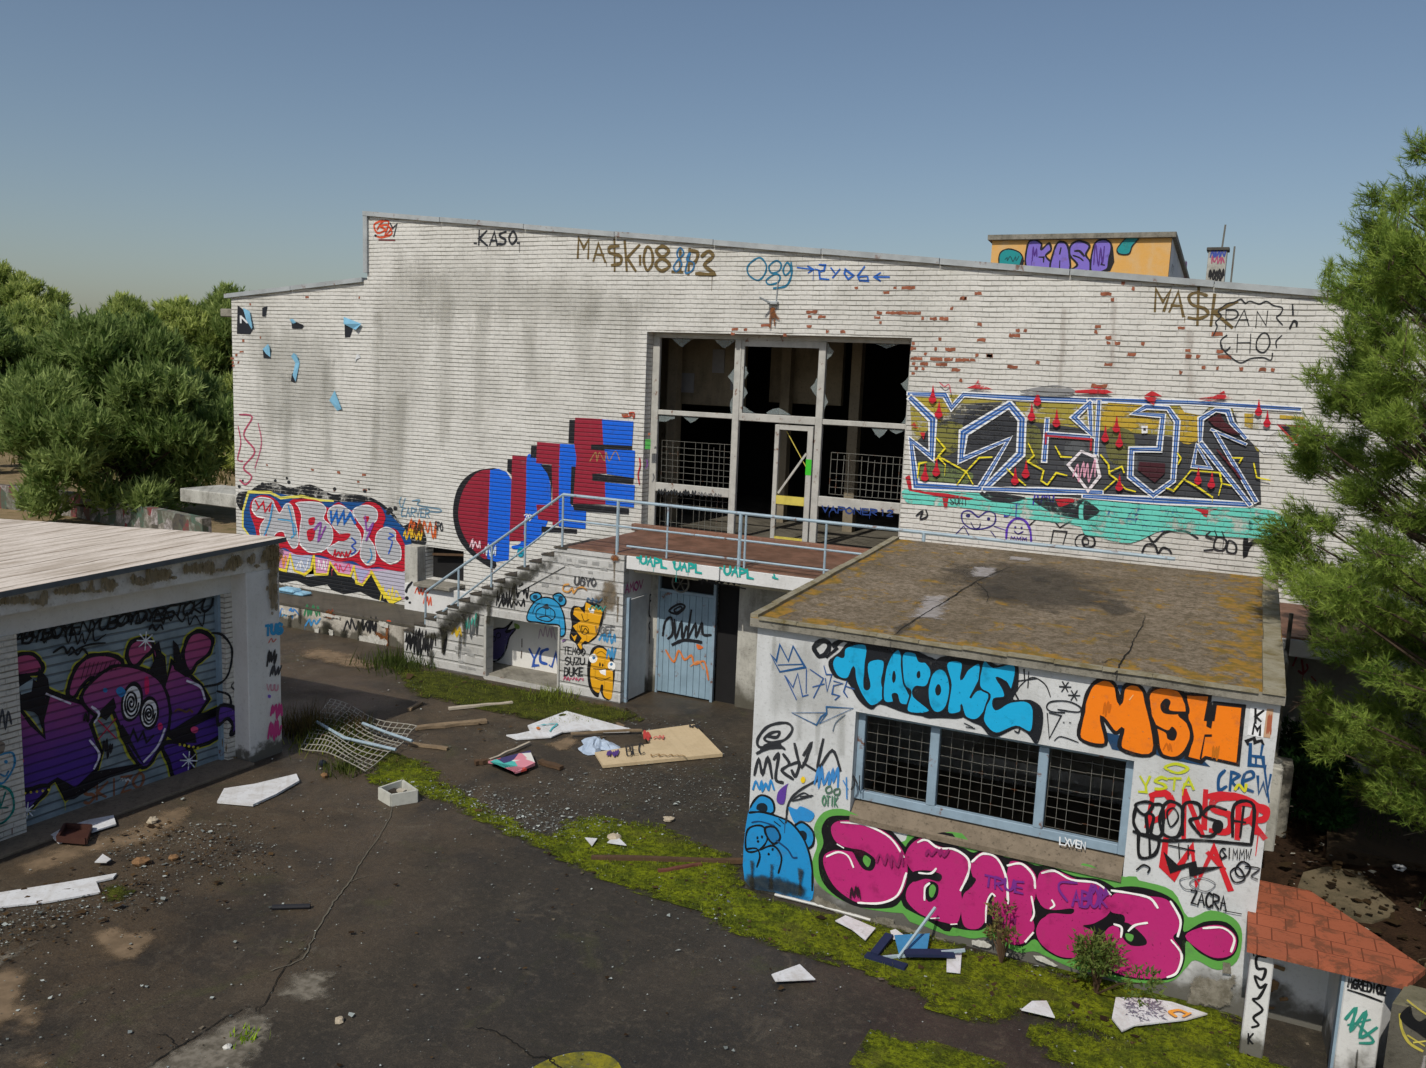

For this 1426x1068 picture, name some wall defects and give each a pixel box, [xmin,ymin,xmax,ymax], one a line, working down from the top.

peeling [874,292,1018,382]
peeling [1094,325,1145,366]
peeling [1179,332,1275,374]
leakage [974,567,994,576]
leakage [916,596,945,619]